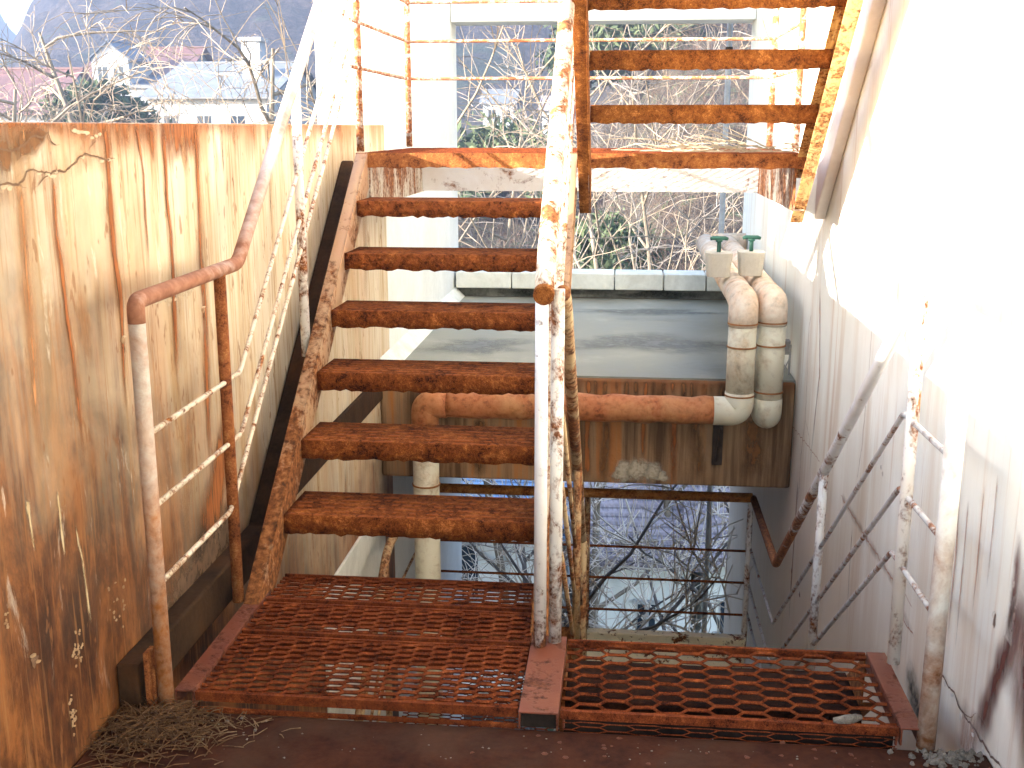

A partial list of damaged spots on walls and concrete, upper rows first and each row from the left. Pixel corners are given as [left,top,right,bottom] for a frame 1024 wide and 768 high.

crack [0,125,117,191]
corrosion [53,183,88,427]
corrosion [0,123,229,411]
corrosion [201,284,225,533]